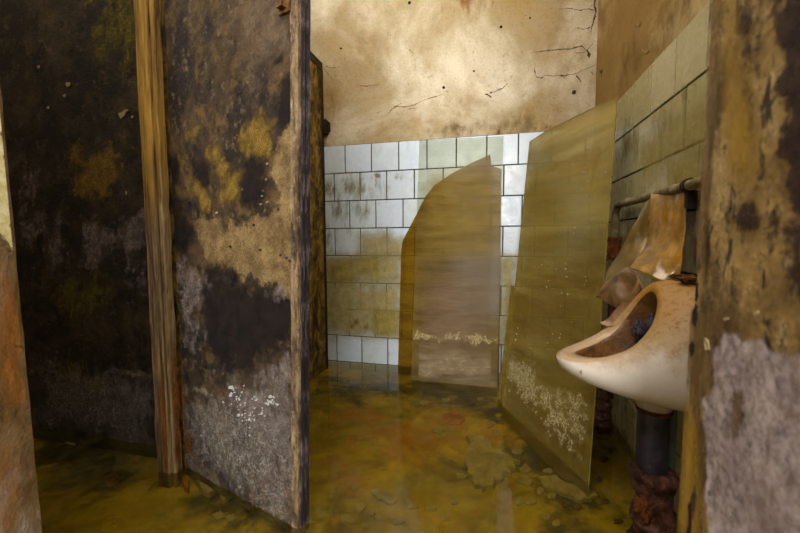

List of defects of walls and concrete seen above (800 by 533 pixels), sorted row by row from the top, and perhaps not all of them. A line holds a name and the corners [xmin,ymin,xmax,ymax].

crack [530,0,597,82]
water stain [720,0,800,297]
water stain [171,109,292,528]
water stain [32,360,153,491]
peeling [686,333,800,533]